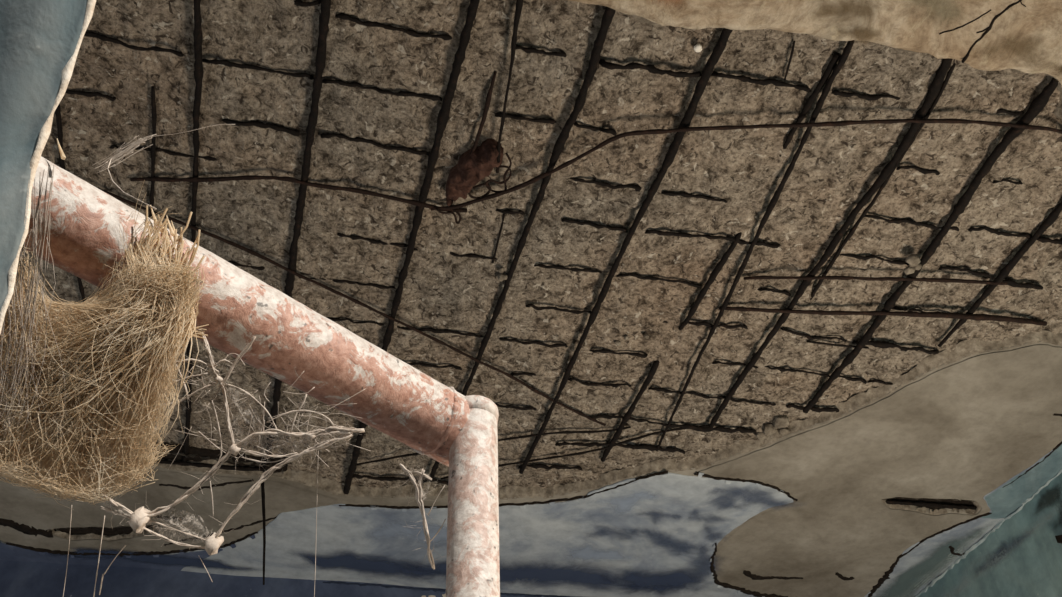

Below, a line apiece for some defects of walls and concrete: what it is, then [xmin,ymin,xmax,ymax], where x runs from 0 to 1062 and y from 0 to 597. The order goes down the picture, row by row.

spalling [546,6,1062,172]
crack [939,0,1026,63]
spalling [16,249,104,312]
spalling [41,0,787,509]
spalling [558,123,1062,462]
spalling [0,336,449,558]
peeling [694,345,1062,597]